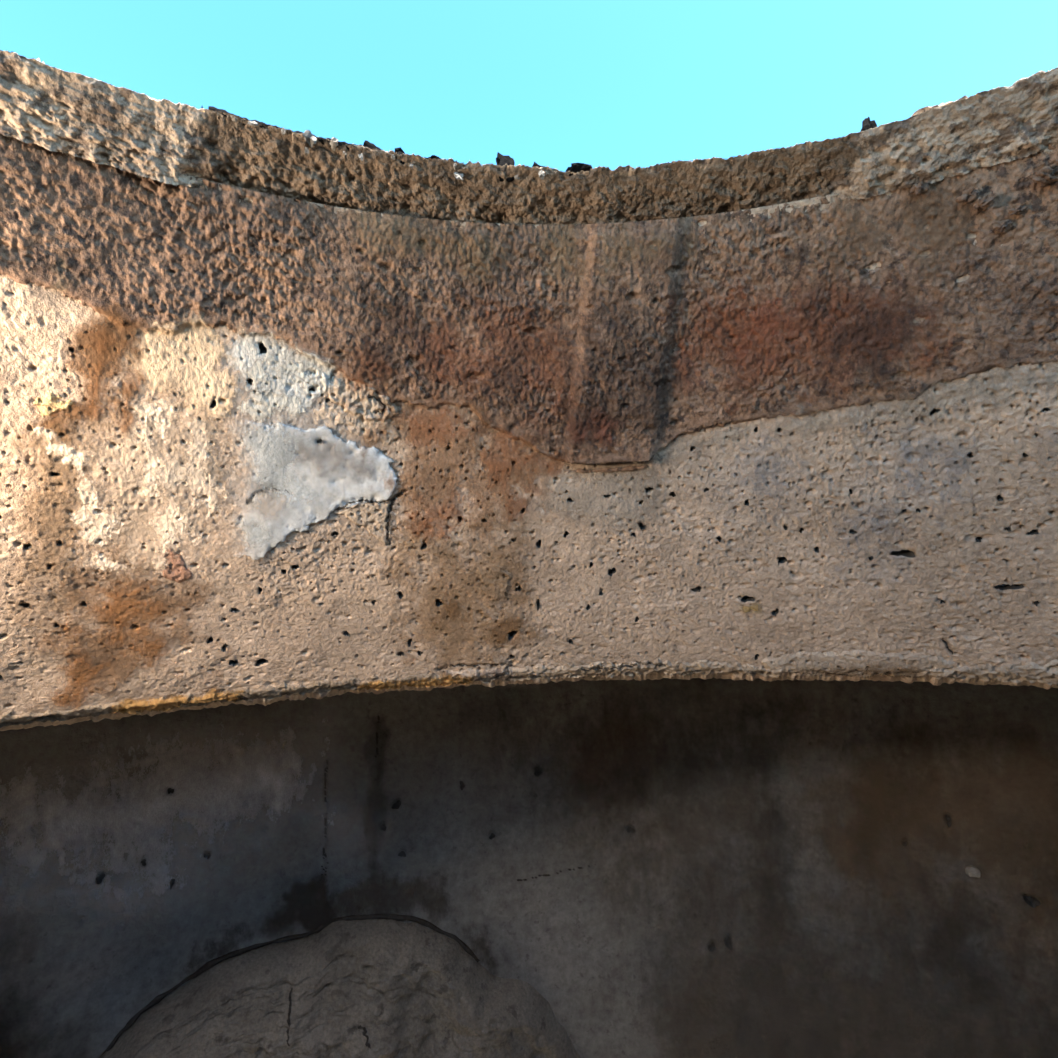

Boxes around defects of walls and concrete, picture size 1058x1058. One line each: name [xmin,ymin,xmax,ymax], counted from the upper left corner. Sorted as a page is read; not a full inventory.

water stain [34,316,335,573]
peeling [0,134,1058,560]